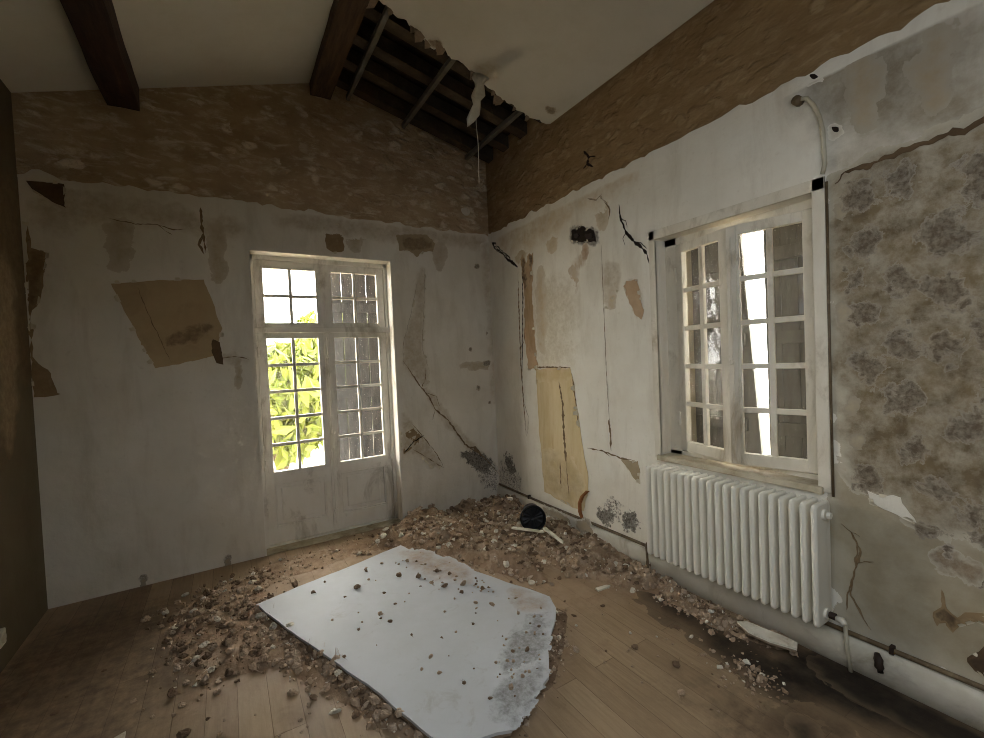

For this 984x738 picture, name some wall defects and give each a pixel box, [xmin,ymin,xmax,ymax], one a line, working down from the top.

peeling [22,221,59,397]
peeling [111,277,224,368]
peeling [396,234,436,388]
crack [588,194,649,460]
peeling [601,259,645,320]
leakage [777,0,984,685]
crack [403,361,499,478]
leakage [460,448,523,494]
leakage [542,447,586,506]
leakage [596,495,641,533]
leakage [632,591,984,738]
peeling [967,647,984,677]